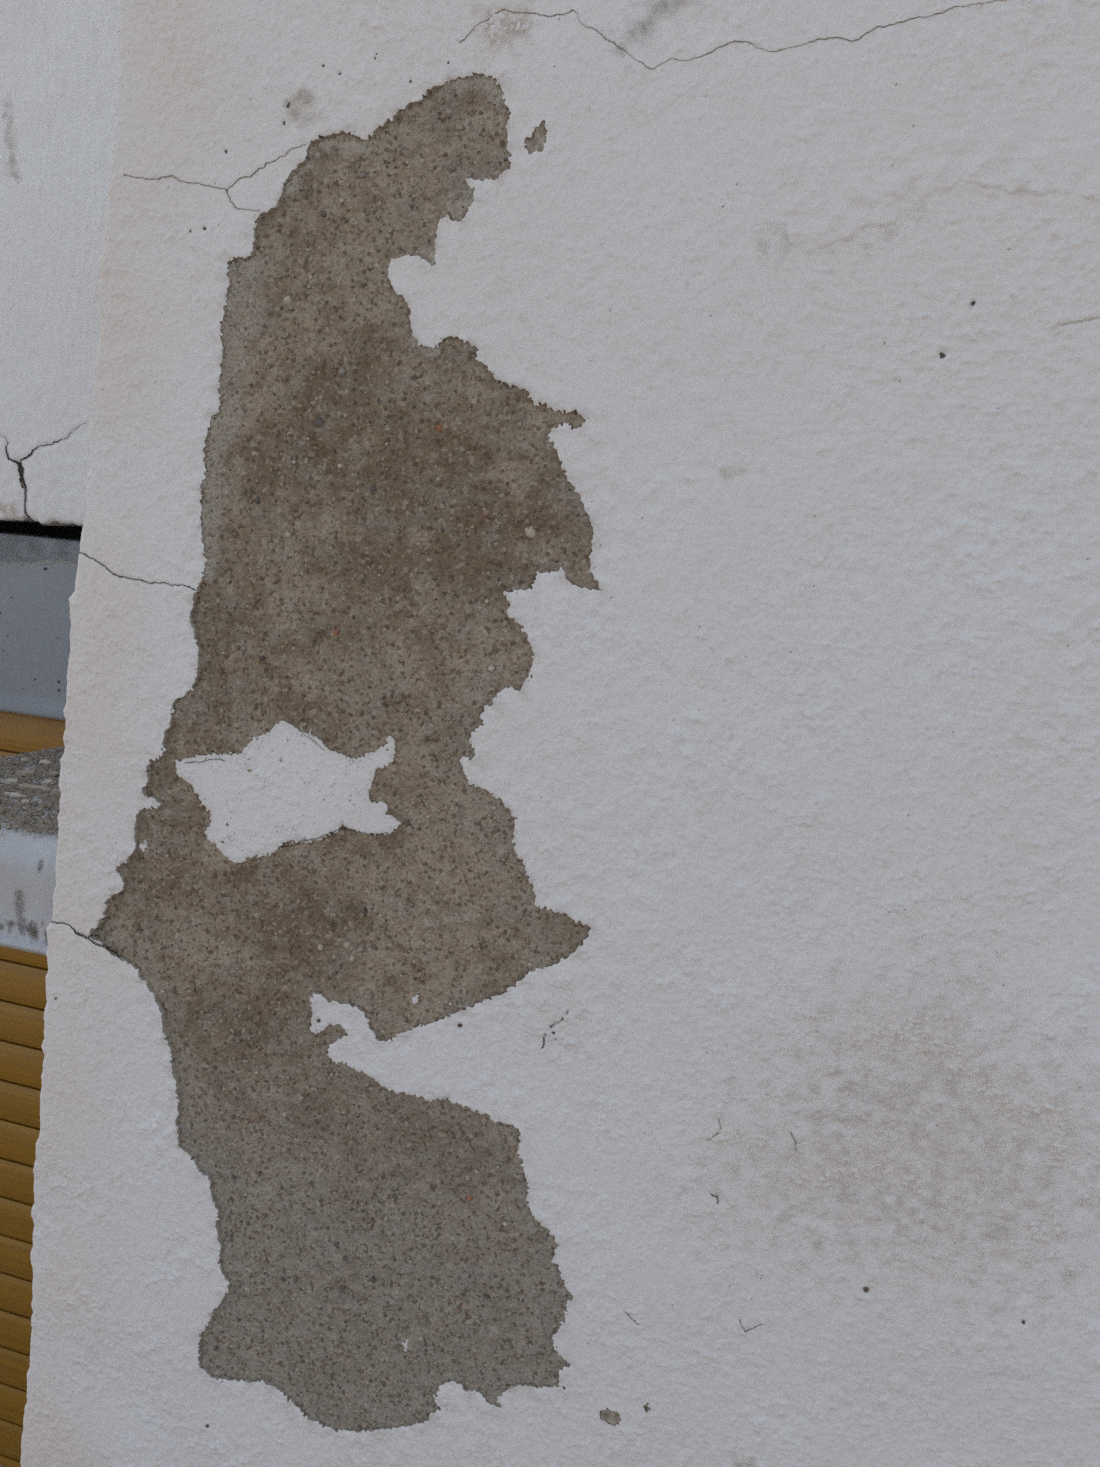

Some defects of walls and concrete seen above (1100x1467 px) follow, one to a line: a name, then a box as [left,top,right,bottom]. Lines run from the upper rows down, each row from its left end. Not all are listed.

crack [460,0,996,69]
crack [123,144,307,211]
crack [5,424,82,523]
flaking render [89,72,602,1433]